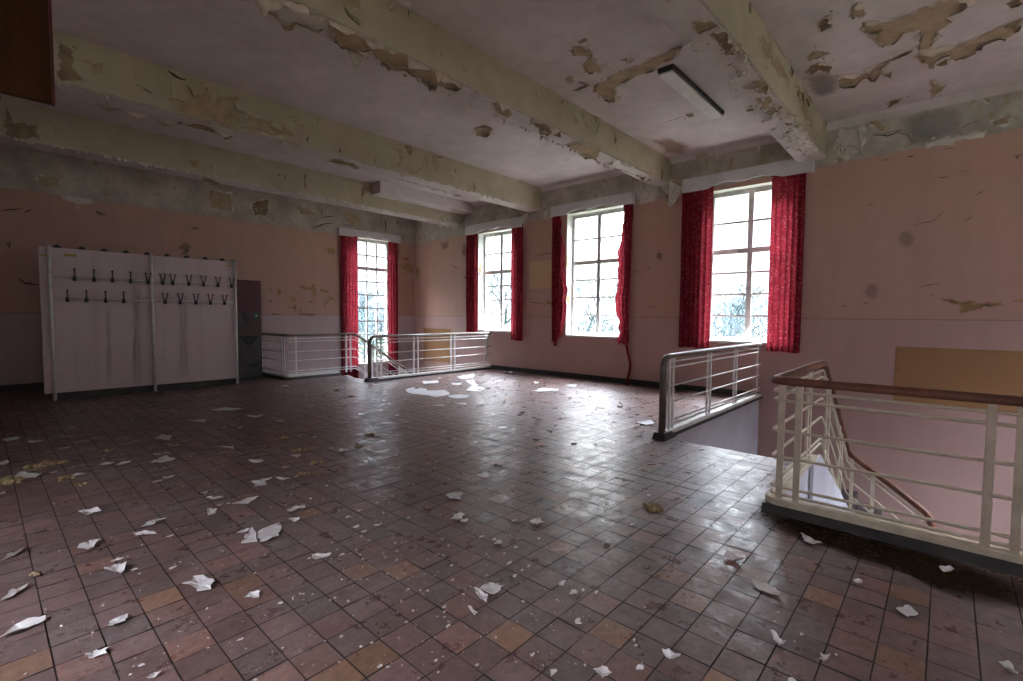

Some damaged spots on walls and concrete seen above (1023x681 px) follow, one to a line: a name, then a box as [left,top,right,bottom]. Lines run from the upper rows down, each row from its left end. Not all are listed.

peeling [54,36,89,87]
peeling [255,0,464,96]
peeling [568,0,1023,163]
peeling [931,295,1023,315]